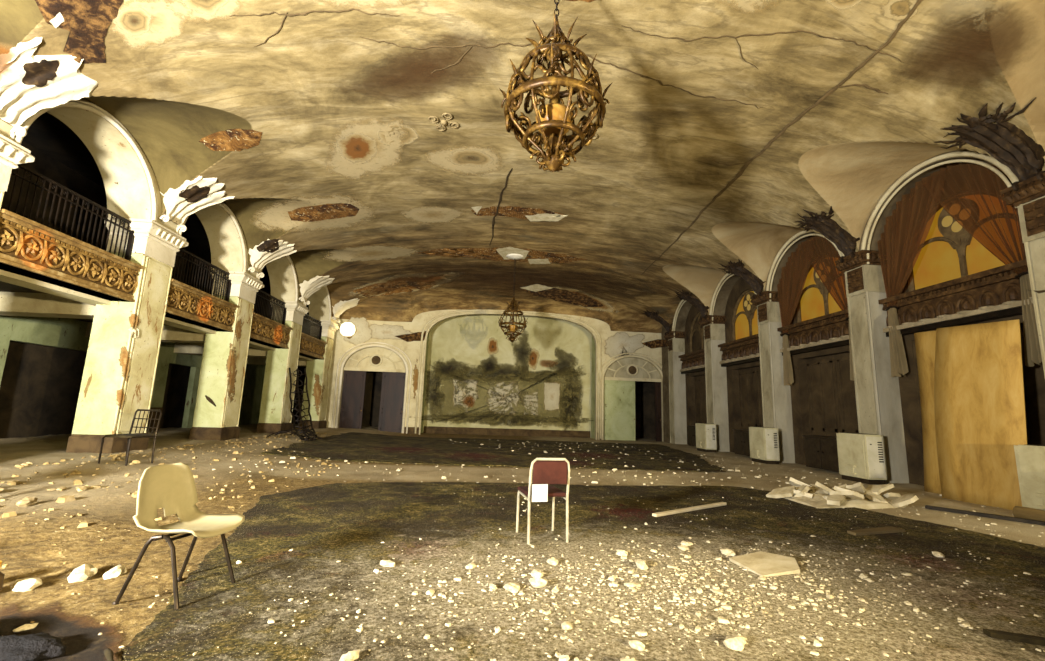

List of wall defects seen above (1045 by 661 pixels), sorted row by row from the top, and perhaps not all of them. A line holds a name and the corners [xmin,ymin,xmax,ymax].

spalling [22,0,123,87]
water stain [112,0,240,48]
water stain [324,0,411,8]
crack [230,8,541,74]
water stain [720,0,777,12]
crack [586,54,762,109]
spalling [199,129,262,152]
crack [622,0,923,275]
spalling [288,203,359,222]
crack [489,168,513,246]
peeling [116,311,141,410]
water stain [409,331,593,430]